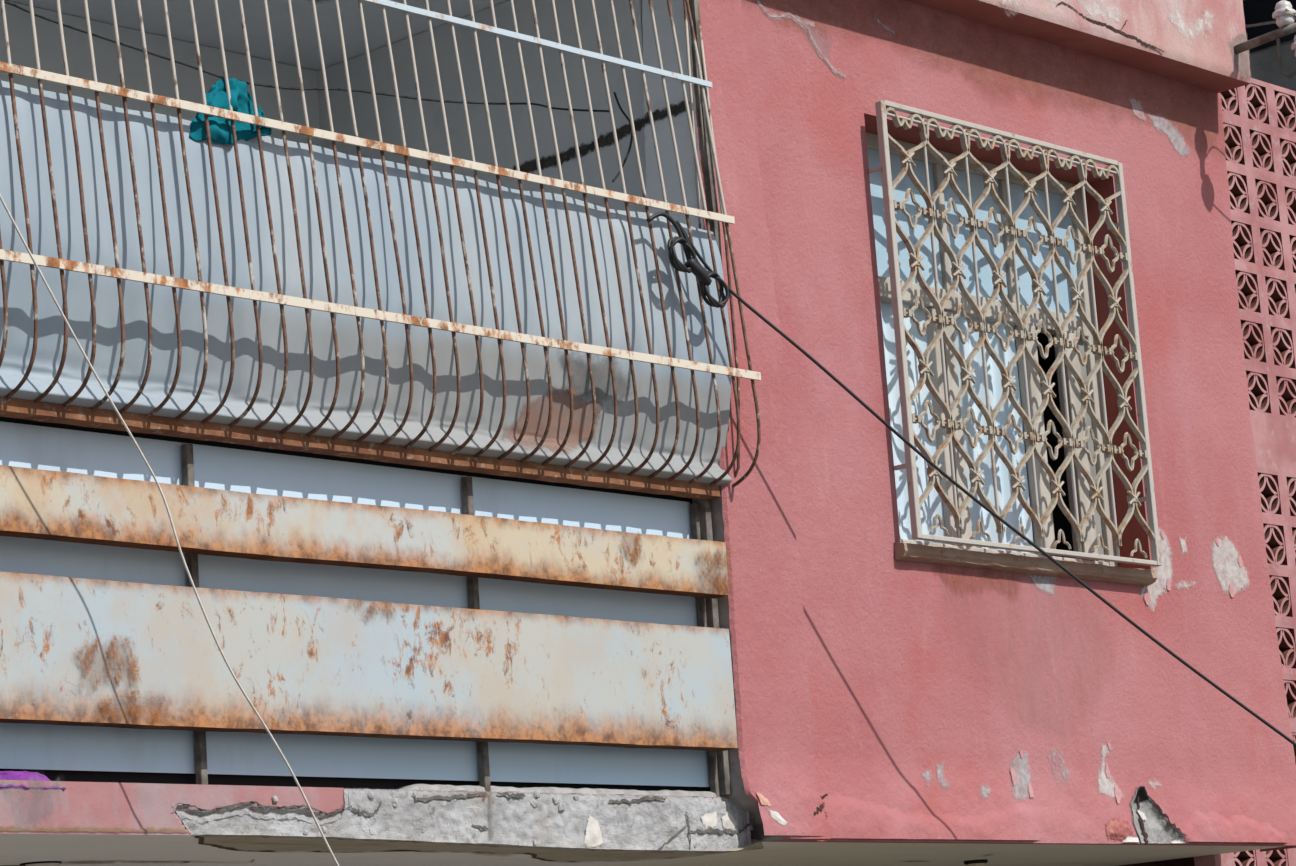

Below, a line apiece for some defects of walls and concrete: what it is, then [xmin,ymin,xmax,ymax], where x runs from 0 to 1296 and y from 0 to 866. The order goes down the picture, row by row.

crack [757,0,846,78]
crack [1057,1,1164,52]
peeling [1171,10,1212,37]
peeling [1129,98,1189,155]
peeling [1140,529,1195,611]
peeling [1212,536,1249,597]
rust [78,636,164,721]
peeling [923,765,949,788]
peeling [1010,750,1034,799]
spalling [1098,741,1191,844]
spalling [172,788,787,862]